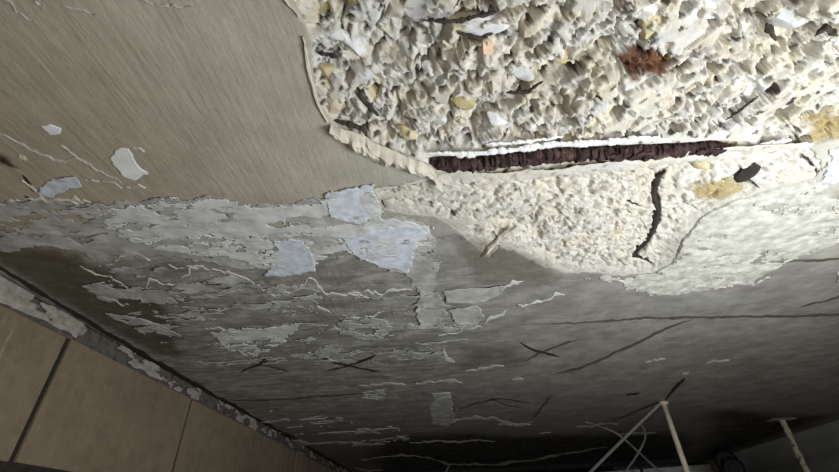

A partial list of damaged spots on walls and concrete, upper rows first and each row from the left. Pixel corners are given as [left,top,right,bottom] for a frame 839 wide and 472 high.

corrosion [614,44,671,80]
spalling [0,0,839,366]
crack [632,169,666,263]
leakage [0,250,179,355]
crack [519,296,839,375]
crack [0,266,369,472]
crack [314,355,381,372]
peeling [260,411,410,446]
leakage [456,415,533,426]
crack [453,395,552,418]
crack [665,378,685,401]
leakage [368,447,605,466]